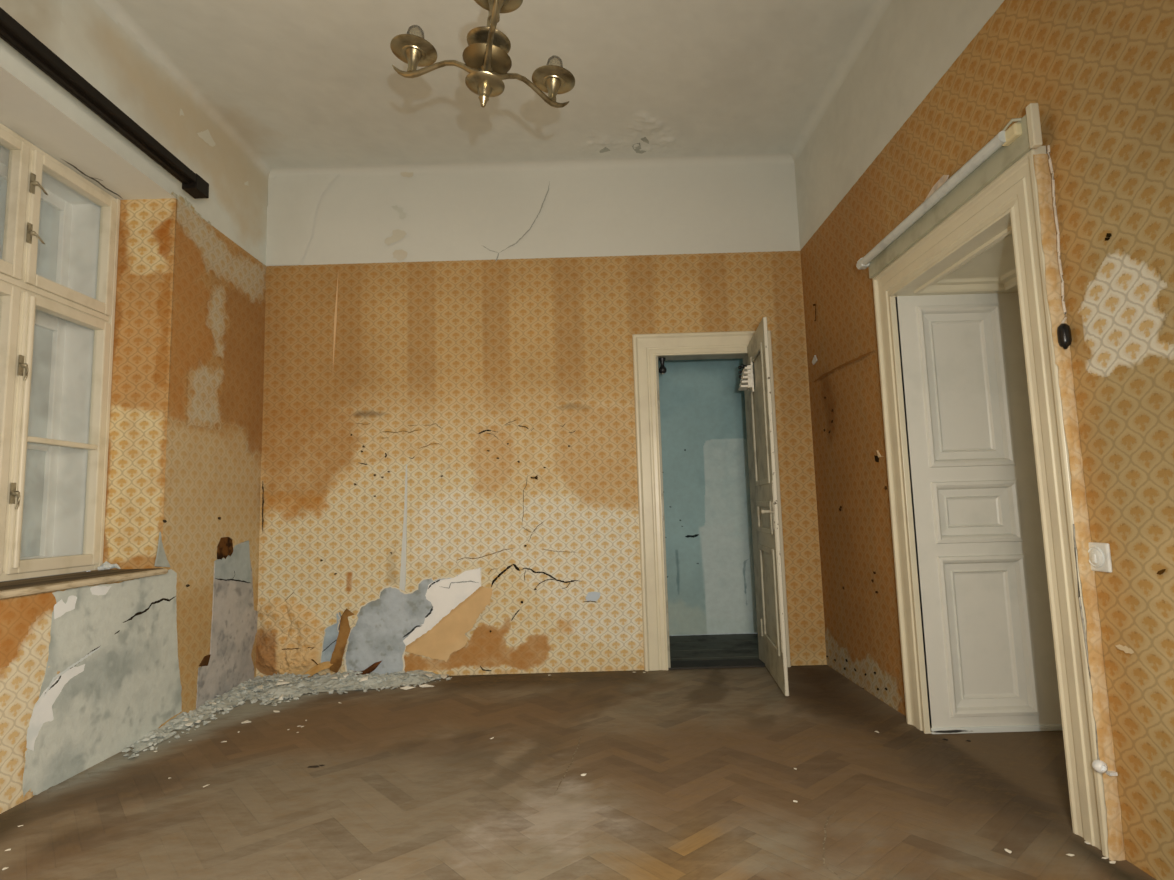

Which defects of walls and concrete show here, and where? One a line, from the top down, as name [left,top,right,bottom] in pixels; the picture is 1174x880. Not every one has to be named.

crack [483,181,550,261]
leakage [103,198,644,676]
crack [456,482,578,589]
leakage [0,590,65,814]
flaking render [22,532,182,800]
crack [45,597,174,693]
flaking render [196,540,258,708]
flaking render [320,567,482,675]